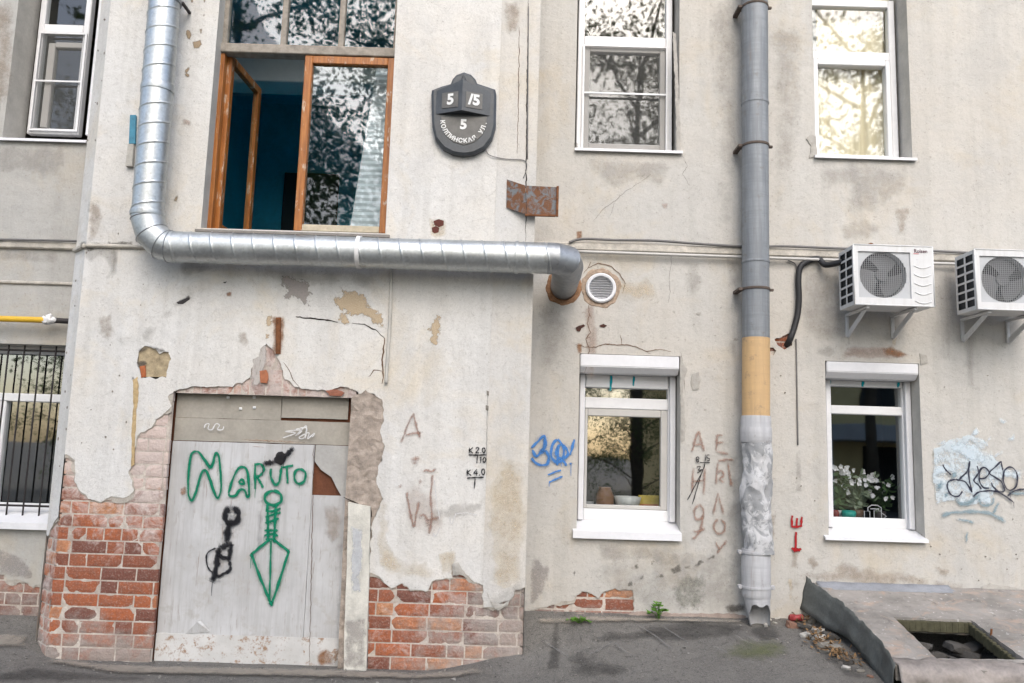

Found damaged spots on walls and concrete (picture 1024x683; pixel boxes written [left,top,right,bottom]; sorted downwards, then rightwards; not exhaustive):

crack [517,31,528,188]
crack [296,316,385,383]
peeling [334,289,383,326]
peeling [428,315,441,345]
crack [577,305,671,354]
spalling [0,316,385,669]
spalling [367,564,635,670]